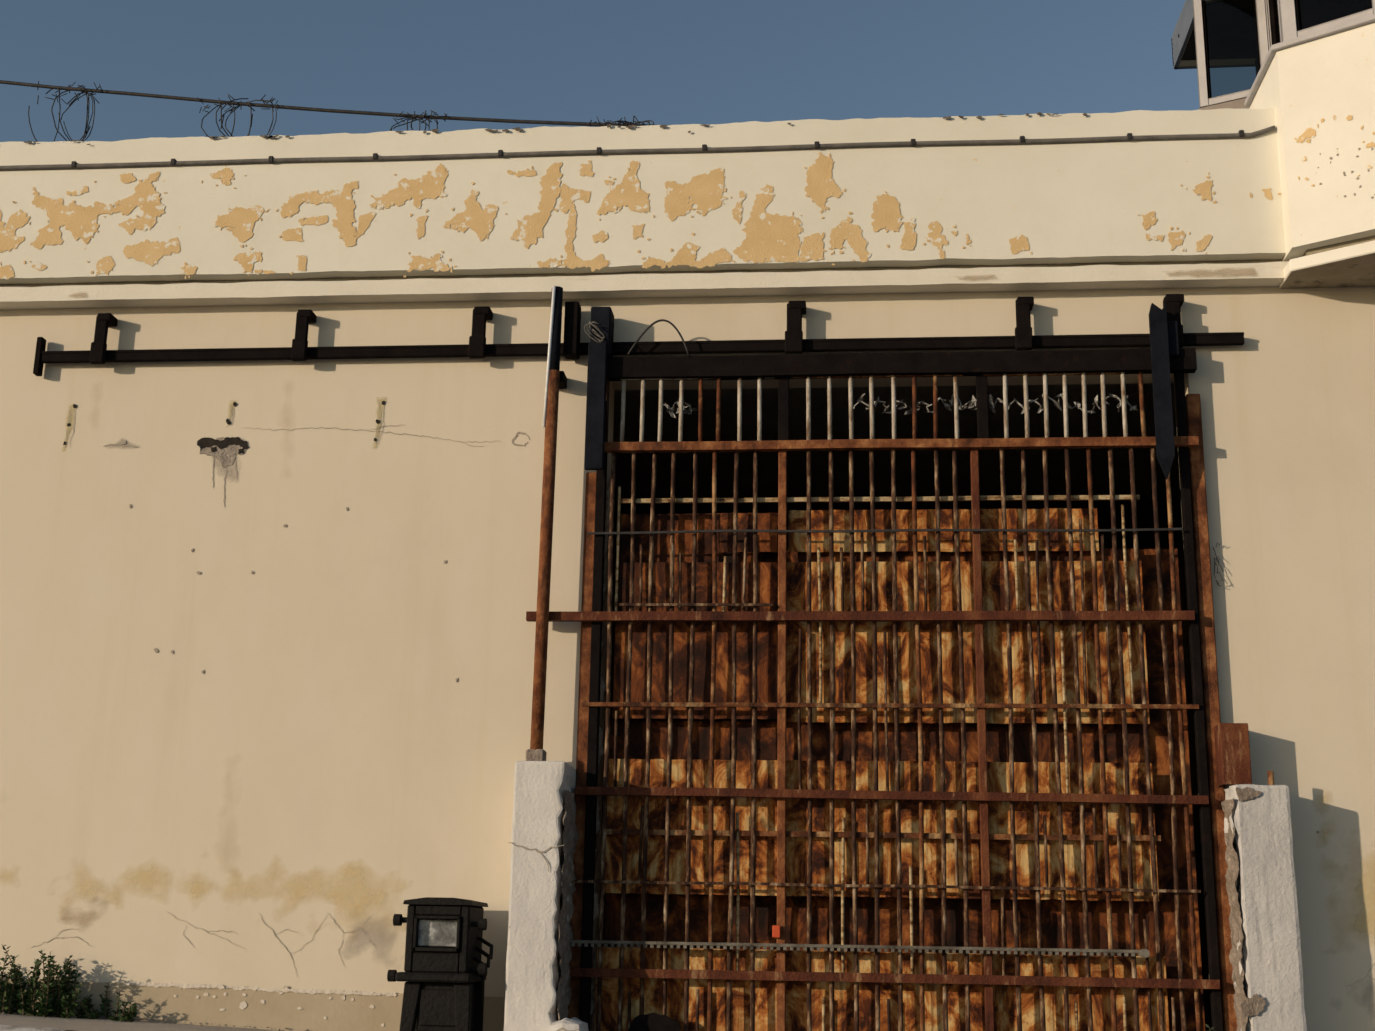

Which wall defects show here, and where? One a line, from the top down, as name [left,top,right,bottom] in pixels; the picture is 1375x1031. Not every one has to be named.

peeling [0,171,197,279]
peeling [201,164,246,189]
peeling [214,149,972,278]
peeling [1009,235,1032,255]
peeling [1137,211,1212,254]
peeling [1180,172,1217,203]
peeling [1295,115,1375,199]
flaking render [197,437,249,507]
damp [1357,869,1375,932]
crack [30,928,90,948]
crack [169,913,383,996]